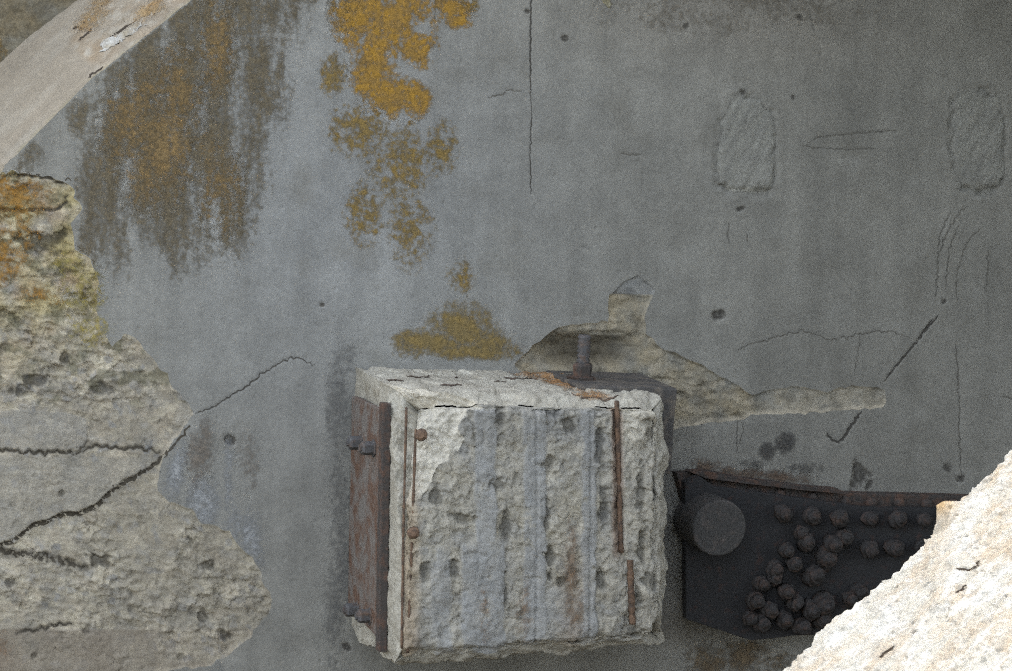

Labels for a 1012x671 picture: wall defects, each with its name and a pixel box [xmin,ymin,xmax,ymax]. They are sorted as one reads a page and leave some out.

damp [67,0,316,272]
crack [488,0,532,191]
spalling [0,170,272,671]
crack [0,356,315,569]
rust [521,371,607,398]
spalling [515,274,938,444]